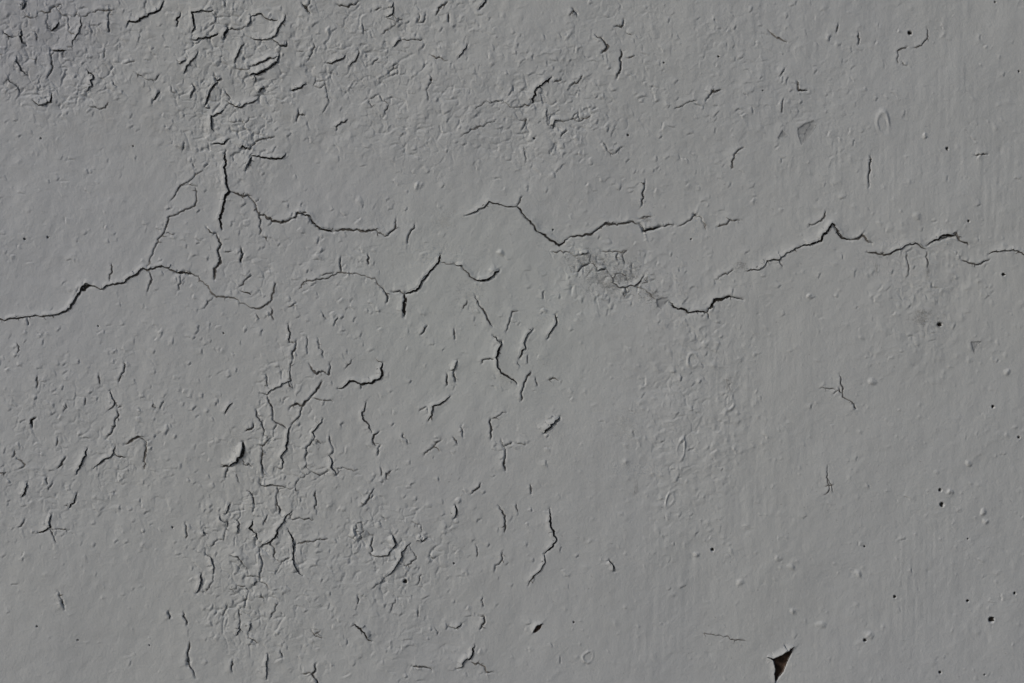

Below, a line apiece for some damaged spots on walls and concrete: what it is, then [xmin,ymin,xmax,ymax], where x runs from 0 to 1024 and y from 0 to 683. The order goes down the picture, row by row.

crack [464,182,739,247]
crack [670,211,1024,318]
crack [0,150,559,518]
crack [823,376,856,409]
crack [476,485,558,586]
crack [168,613,195,676]
crack [353,598,373,641]
crack [413,598,490,673]
peeling [766,643,794,683]